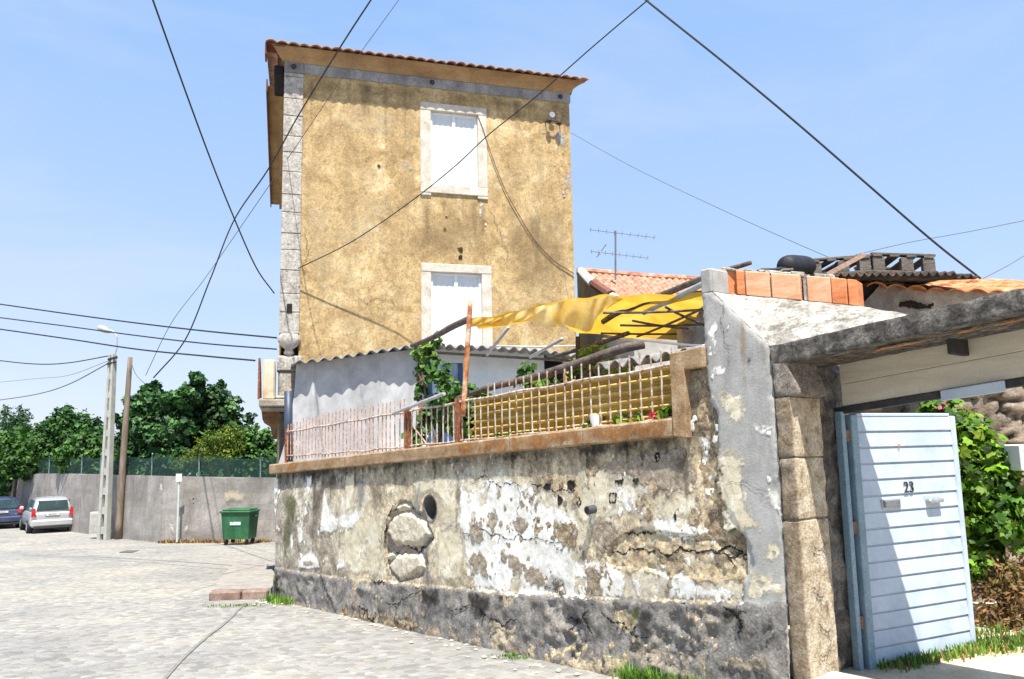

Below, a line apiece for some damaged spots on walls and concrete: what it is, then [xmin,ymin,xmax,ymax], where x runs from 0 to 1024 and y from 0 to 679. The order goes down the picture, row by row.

peeling [274,322,784,679]
leakage [421,538,439,607]
leakage [468,593,511,616]
crack [358,470,747,627]
leakage [633,607,651,631]